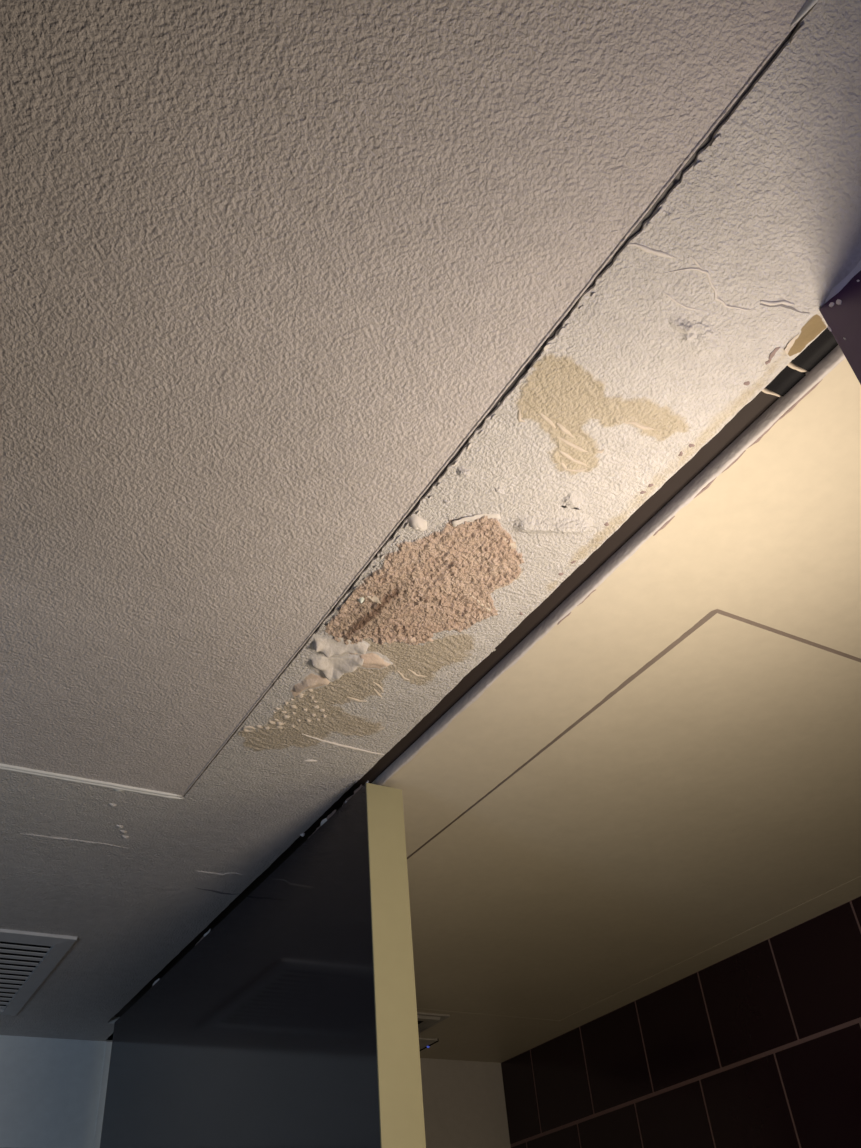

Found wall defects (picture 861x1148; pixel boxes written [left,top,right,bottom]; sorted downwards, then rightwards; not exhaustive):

spalling [528,323,569,373]
leakage [501,341,697,481]
peeling [288,511,532,698]
leakage [231,626,495,762]